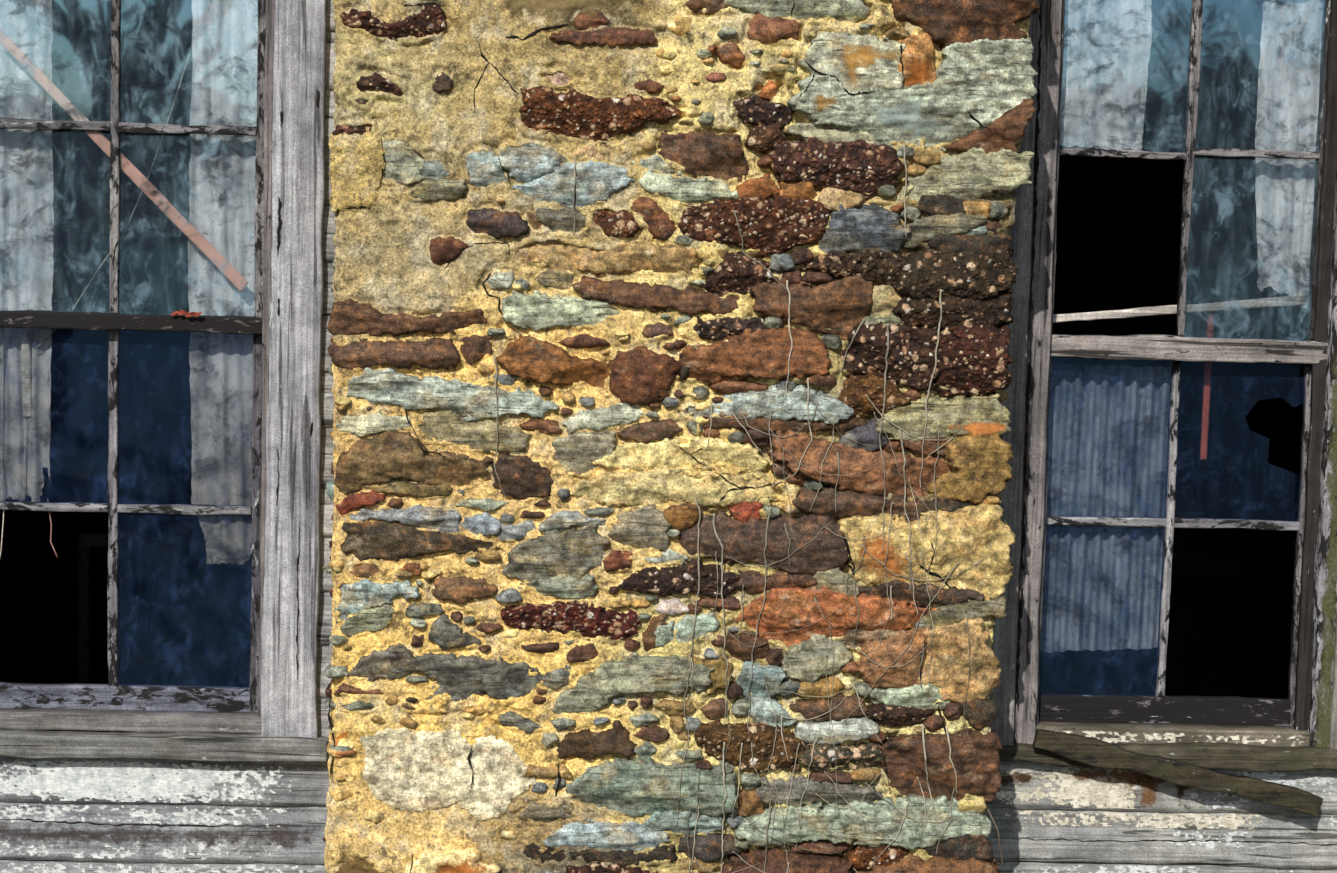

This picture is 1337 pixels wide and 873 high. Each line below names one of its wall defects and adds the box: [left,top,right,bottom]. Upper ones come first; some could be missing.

crack [404,2,447,19]
crack [473,24,567,113]
peeling [0,760,303,873]
peeling [996,767,1263,849]
peeling [1237,771,1337,795]
peeling [999,864,1200,873]